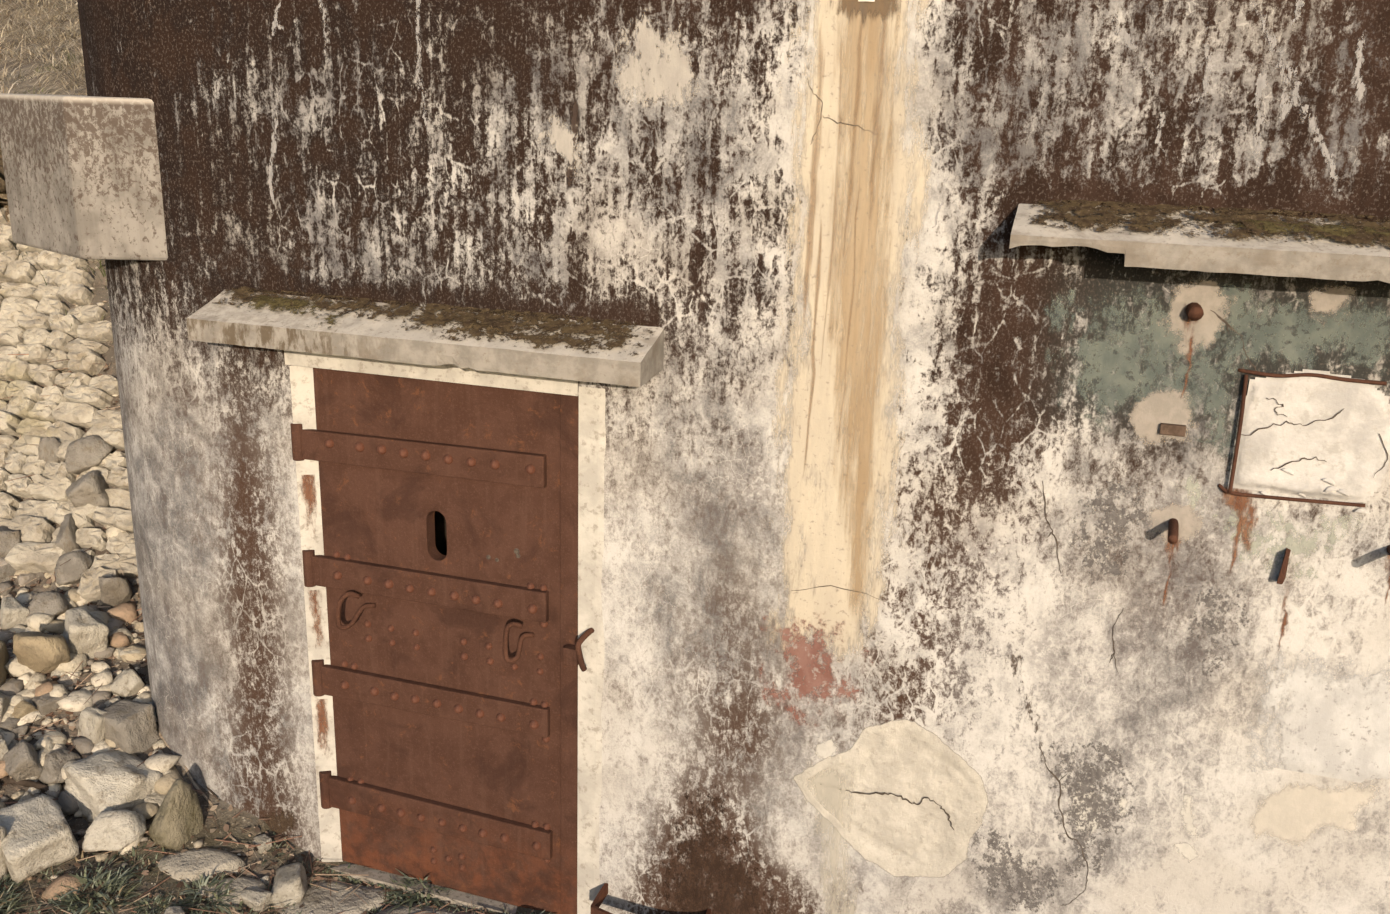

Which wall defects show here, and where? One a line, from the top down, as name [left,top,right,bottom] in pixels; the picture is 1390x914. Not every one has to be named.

water stain [268,94,279,204]
water stain [415,0,427,126]
water stain [566,101,580,189]
crack [807,78,876,145]
water stain [1155,112,1165,153]
water stain [1250,0,1341,192]
water stain [1351,38,1365,101]
rust [302,475,316,514]
rust [1224,488,1258,571]
rust [309,590,323,641]
rust [316,699,328,748]
crack [1039,745,1089,906]